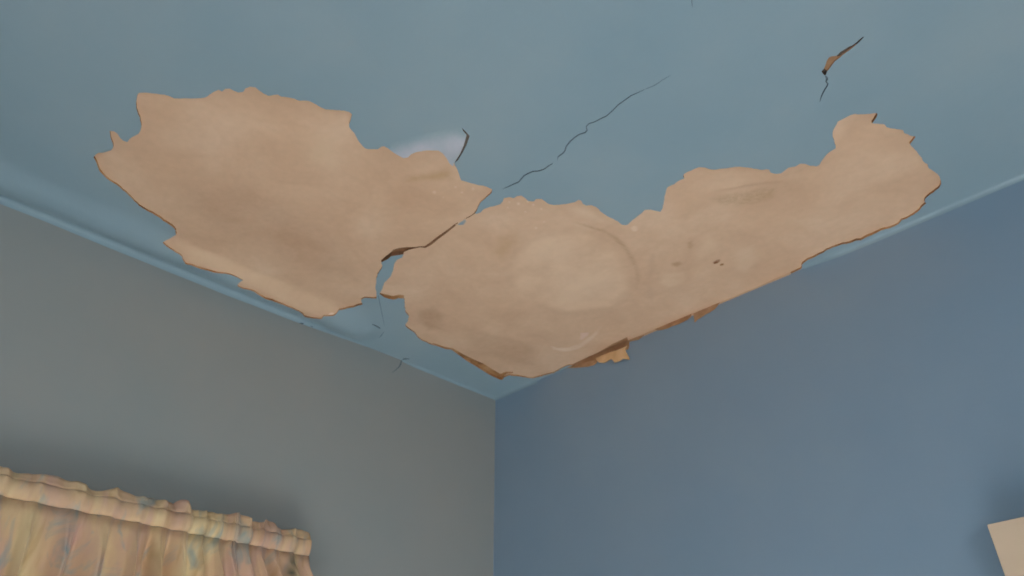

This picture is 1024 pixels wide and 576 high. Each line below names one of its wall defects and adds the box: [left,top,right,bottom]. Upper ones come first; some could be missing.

flaking render [94,87,941,380]
crack [506,77,667,188]